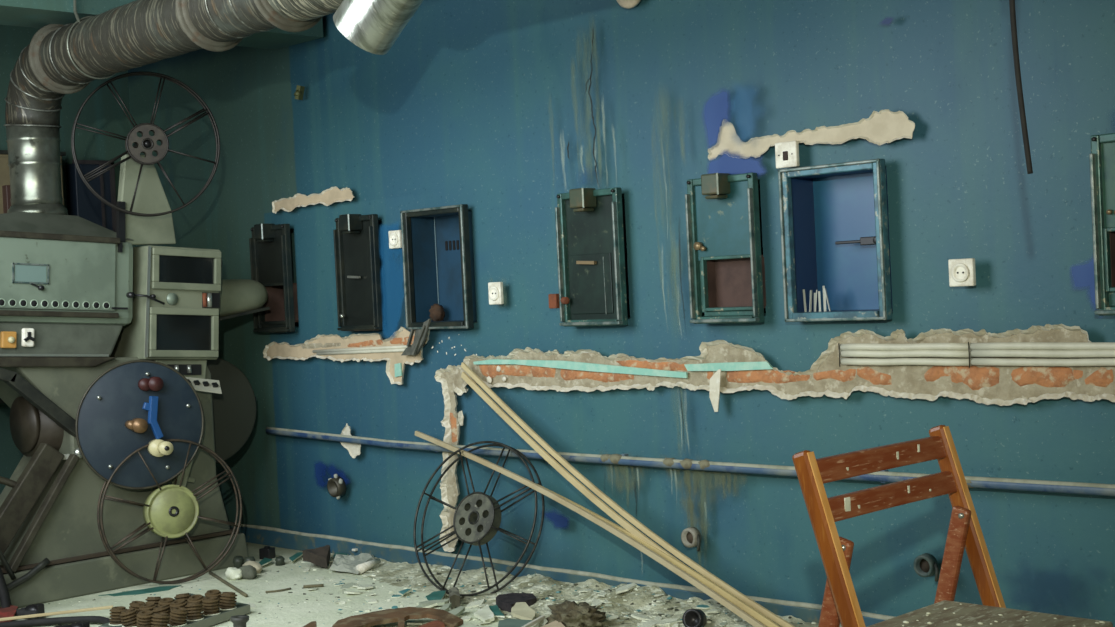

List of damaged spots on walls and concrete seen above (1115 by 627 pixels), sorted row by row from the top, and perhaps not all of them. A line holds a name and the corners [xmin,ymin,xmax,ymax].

flaking render [272,186,354,214]
crack [567,27,600,187]
flaking render [708,109,915,160]
spalling [263,318,1115,552]